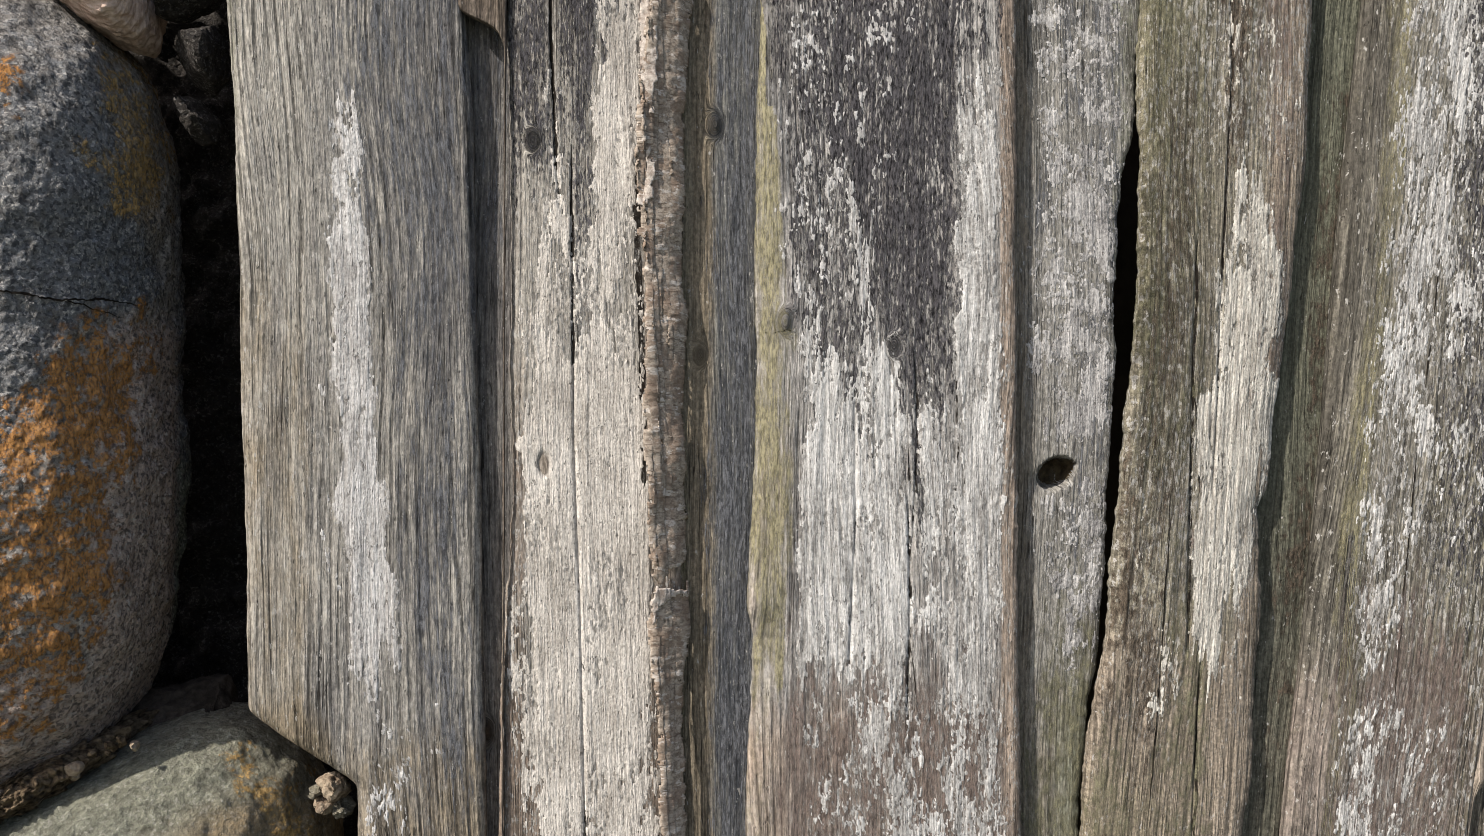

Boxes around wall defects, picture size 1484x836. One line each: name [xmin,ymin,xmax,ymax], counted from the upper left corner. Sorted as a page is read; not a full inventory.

crack [0,290,138,319]